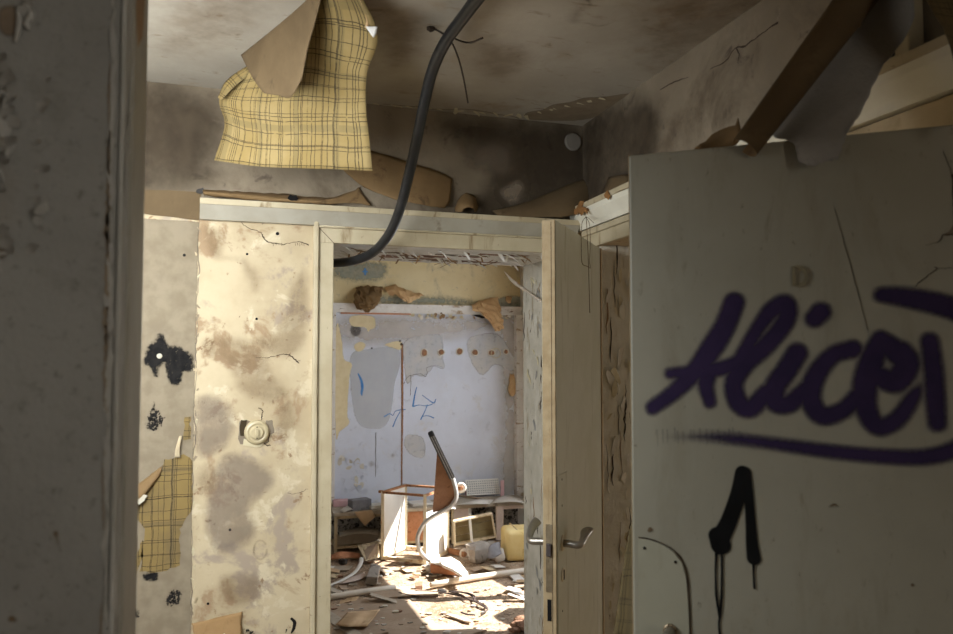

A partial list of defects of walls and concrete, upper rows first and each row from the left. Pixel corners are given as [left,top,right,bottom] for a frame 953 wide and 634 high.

peeling [0,0,35,43]
peeling [0,52,21,193]
crack [241,222,309,246]
peeling [409,312,483,320]
peeling [498,277,541,341]
peeling [335,315,514,439]